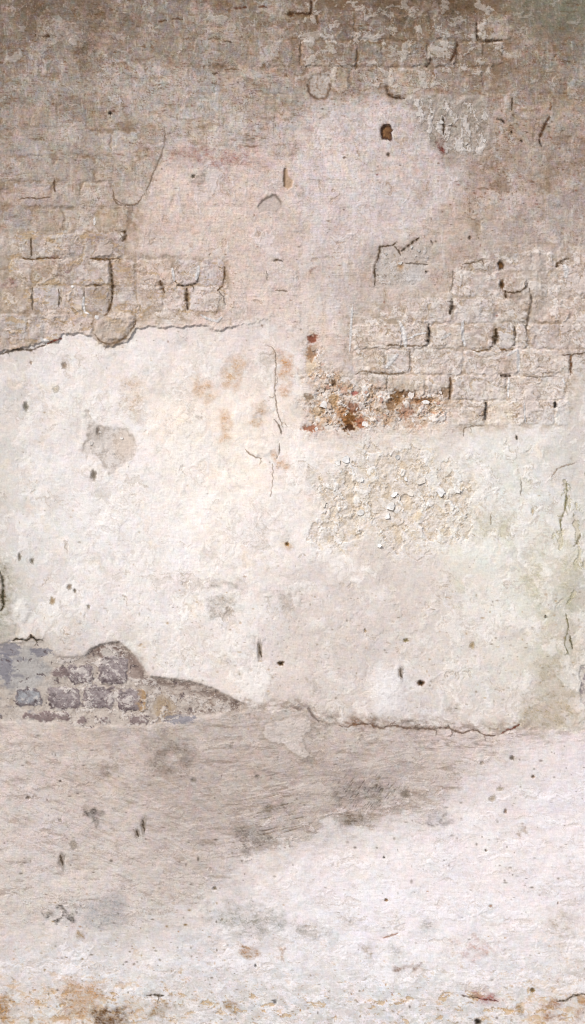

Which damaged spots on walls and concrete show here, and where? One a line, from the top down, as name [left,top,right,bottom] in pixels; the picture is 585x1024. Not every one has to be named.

peeling [409,94,492,159]
spalling [258,169,293,216]
spalling [0,218,232,350]
crack [245,347,287,496]
spalling [296,237,585,562]
spalling [0,641,245,730]
crack [348,722,520,737]